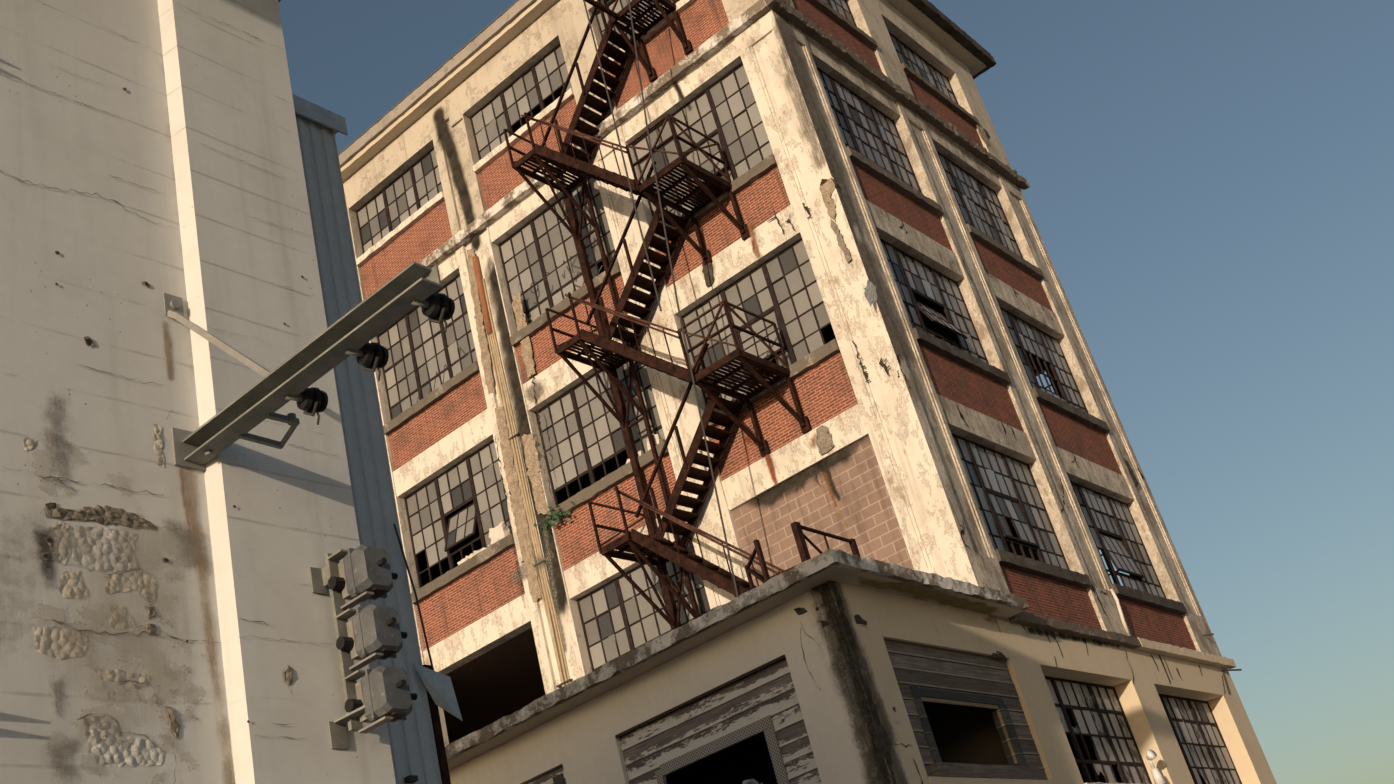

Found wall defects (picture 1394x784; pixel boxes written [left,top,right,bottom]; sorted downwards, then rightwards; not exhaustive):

crack [1,171,177,230]
spalling [812,425,835,455]
peeling [43,502,158,636]
rust [180,468,219,694]
peeling [32,626,150,689]
leakage [810,580,907,784]
peeling [79,706,180,767]